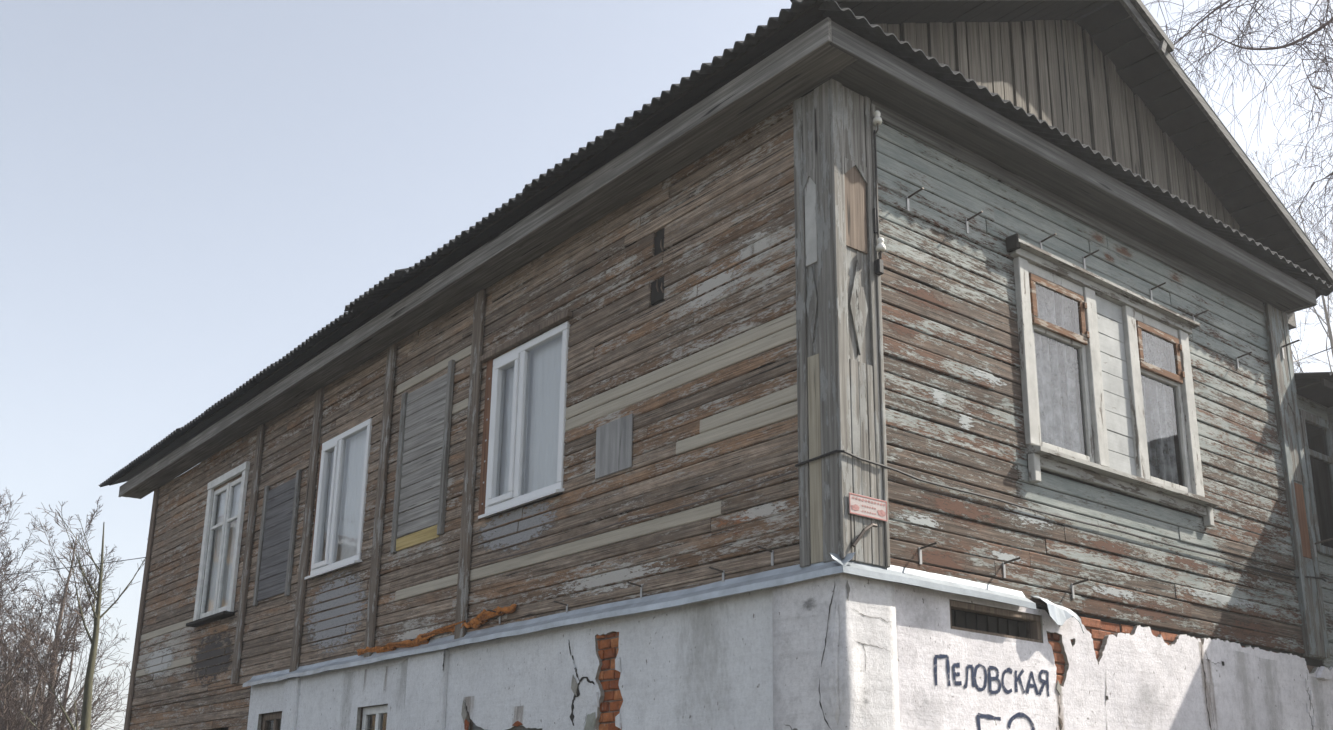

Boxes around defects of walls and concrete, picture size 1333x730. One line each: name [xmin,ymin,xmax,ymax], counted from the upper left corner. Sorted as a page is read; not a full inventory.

peeling [546,558,676,601]
peeling [391,622,442,642]
flaking render [1079,616,1133,659]
flaking render [1151,630,1178,645]
crack [569,642,595,729]
flaking render [584,632,623,730]
flaking render [1047,633,1073,695]